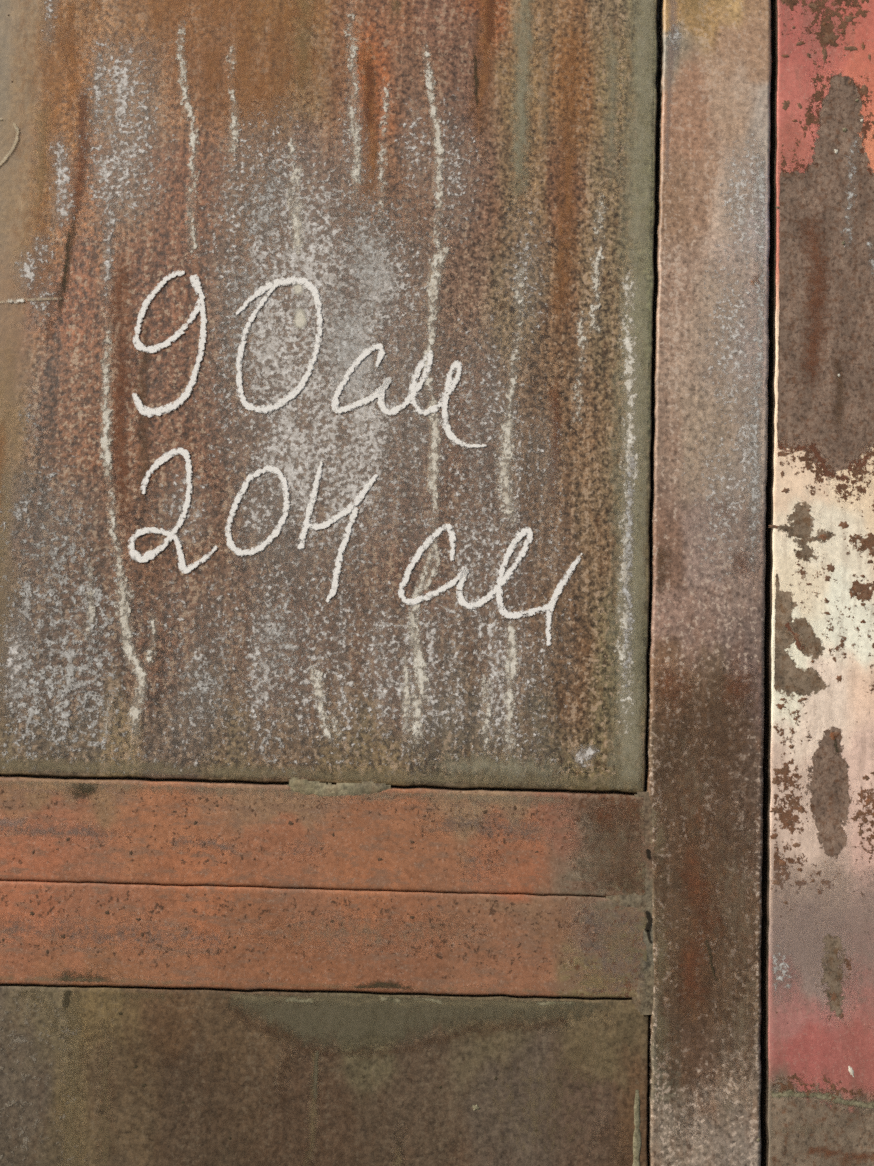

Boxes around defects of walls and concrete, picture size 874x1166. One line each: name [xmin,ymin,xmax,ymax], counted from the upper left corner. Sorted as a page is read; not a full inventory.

peeling [781,0,871,69]
rust [47,97,87,310]
rust [113,339,148,499]
peeling [768,471,874,928]